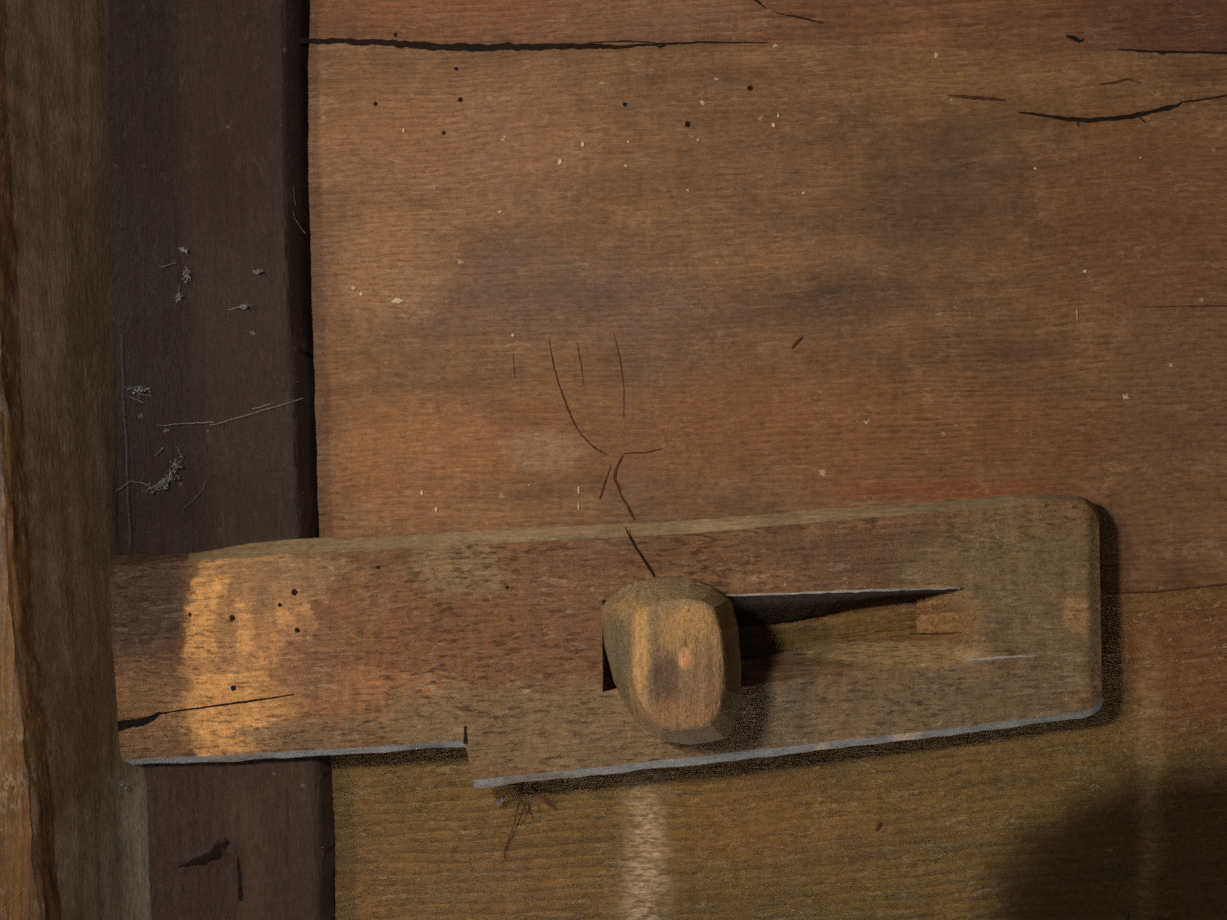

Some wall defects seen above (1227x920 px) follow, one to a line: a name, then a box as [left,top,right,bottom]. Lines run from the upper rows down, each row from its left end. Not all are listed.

crack [299,38,767,52]
crack [754,0,823,23]
crack [1018,49,1227,126]
crack [549,339,607,455]
crack [613,333,624,418]
crack [625,527,655,577]